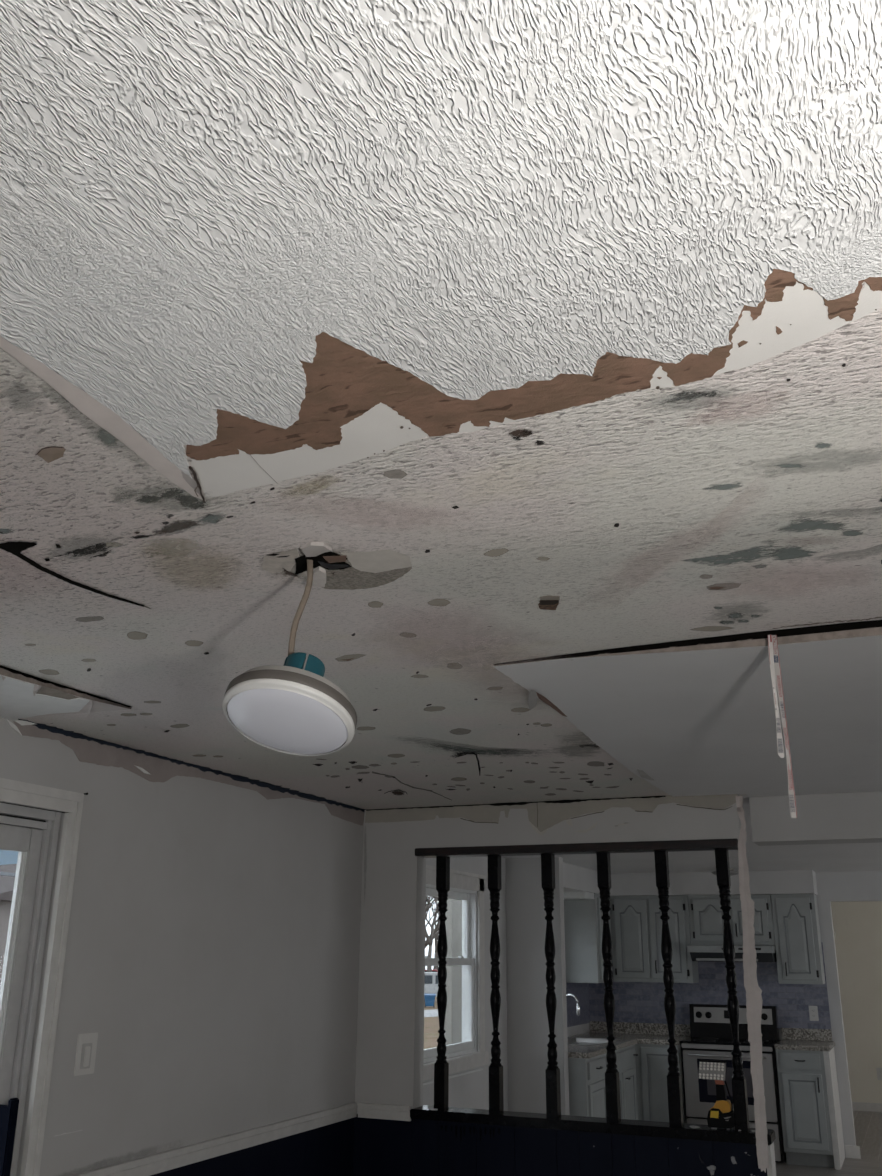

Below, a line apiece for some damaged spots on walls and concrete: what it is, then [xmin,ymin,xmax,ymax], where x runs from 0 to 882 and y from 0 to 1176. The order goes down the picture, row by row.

water stain [667,391,720,403]
water stain [99,430,117,444]
water stain [509,429,545,445]
mould [55,488,225,558]
mould [780,519,863,536]
peeling [261,549,299,573]
peeling [341,549,412,573]
mould [685,545,816,568]
crack [0,546,151,609]
water stain [432,743,619,796]